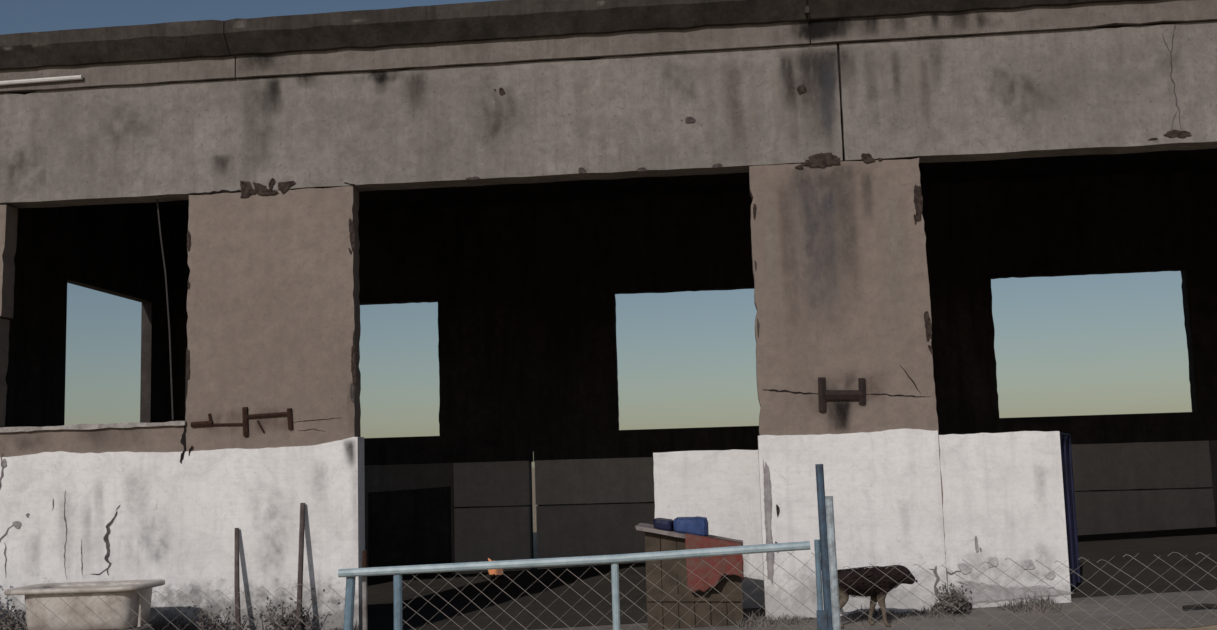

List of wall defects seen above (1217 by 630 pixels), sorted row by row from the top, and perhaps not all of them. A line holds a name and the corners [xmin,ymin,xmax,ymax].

crack [1162,23,1182,131]
spalling [795,152,841,169]
spalling [240,178,296,198]
crack [764,387,818,395]
crack [866,365,931,397]
crack [180,424,193,464]
crack [0,453,8,489]
crack [0,525,13,574]
crack [52,491,120,577]